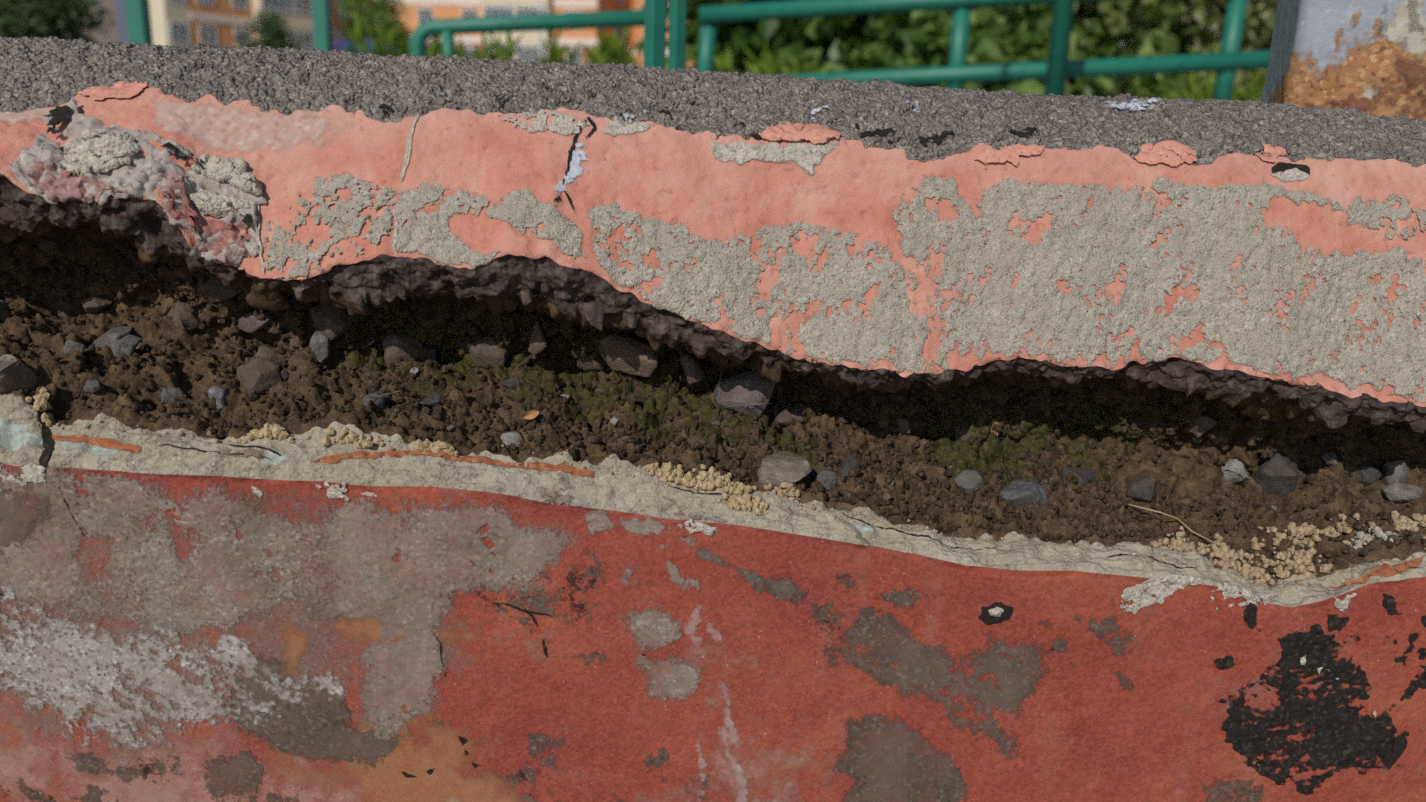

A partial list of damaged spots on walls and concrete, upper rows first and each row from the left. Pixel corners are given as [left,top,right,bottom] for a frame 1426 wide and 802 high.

corrosion [1268,0,1426,120]
crack [256,204,264,273]
crack [392,114,419,254]
crack [554,117,596,212]
spalling [0,96,1426,577]
flaking render [0,387,1426,768]